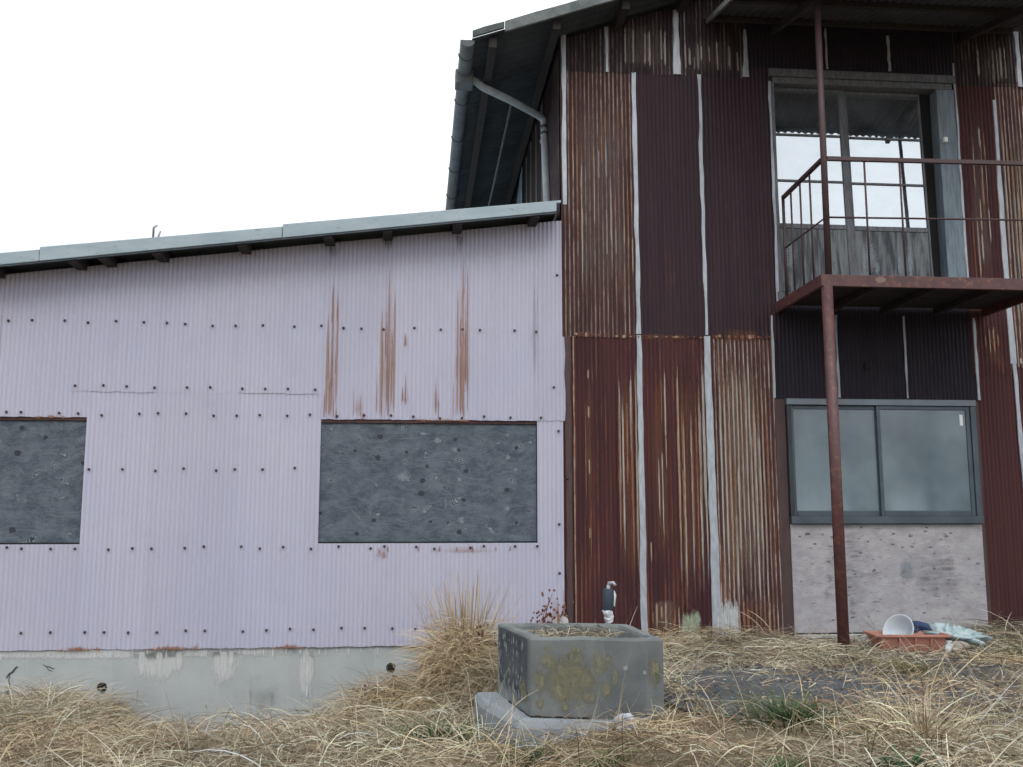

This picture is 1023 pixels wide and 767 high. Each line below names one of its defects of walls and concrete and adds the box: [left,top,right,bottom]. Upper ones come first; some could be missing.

rust [624,29,666,67]
rust [684,41,739,71]
rust [572,94,634,271]
rust [973,128,991,272]
rust [1003,140,1023,279]
rust [323,289,338,416]
rust [376,279,406,417]
rust [453,273,468,422]
rust [618,372,639,560]
rust [658,367,709,582]
rust [719,359,775,633]
water stain [0,647,379,696]